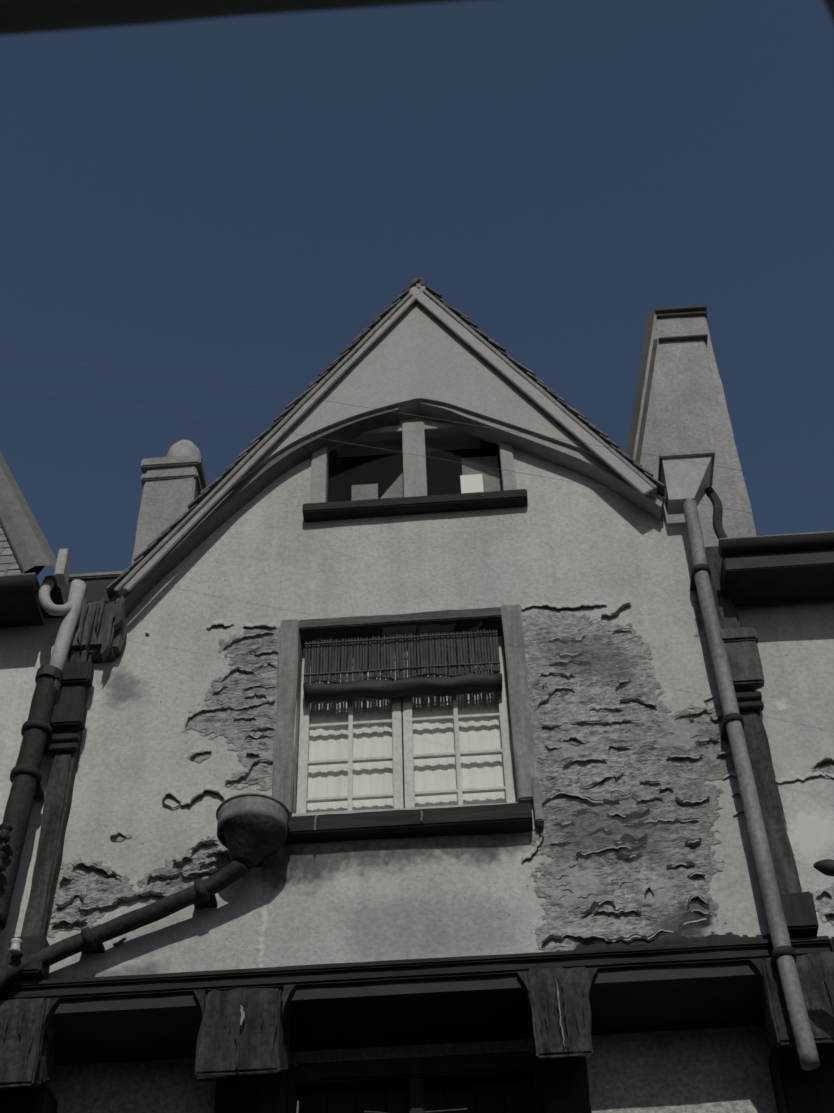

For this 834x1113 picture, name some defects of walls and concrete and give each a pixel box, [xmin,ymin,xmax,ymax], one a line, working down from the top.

flaking render [182,626,281,790]
flaking render [522,603,771,952]
crack [776,762,834,784]
flaking render [811,757,834,779]
flaking render [48,835,232,937]
flaking render [812,883,834,926]